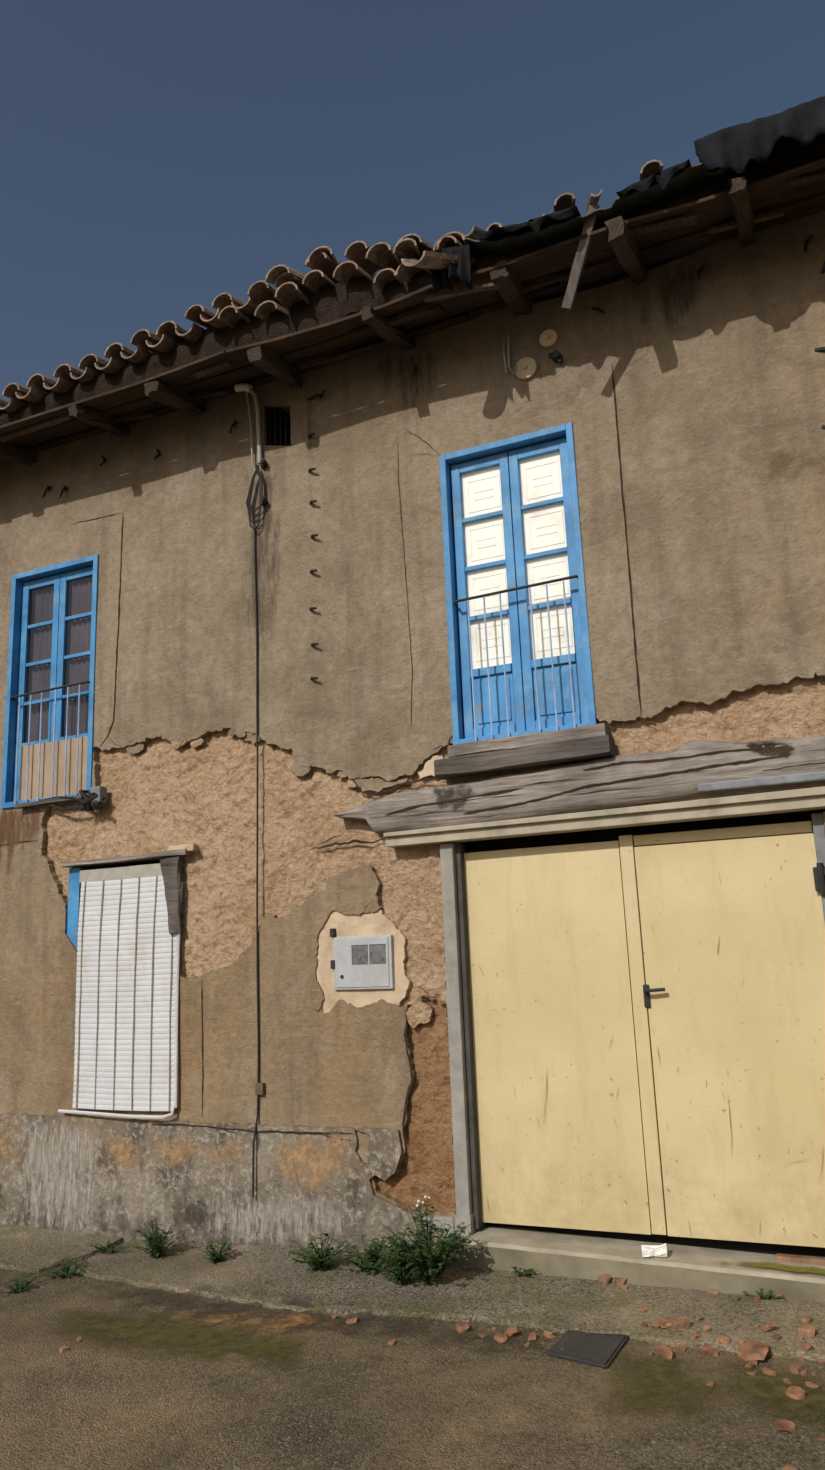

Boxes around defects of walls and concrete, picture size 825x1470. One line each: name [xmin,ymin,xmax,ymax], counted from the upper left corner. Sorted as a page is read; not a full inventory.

spalling [599,676,825,756]
spalling [46,729,515,1212]
water stain [0,1126,132,1226]
water stain [184,1135,348,1238]